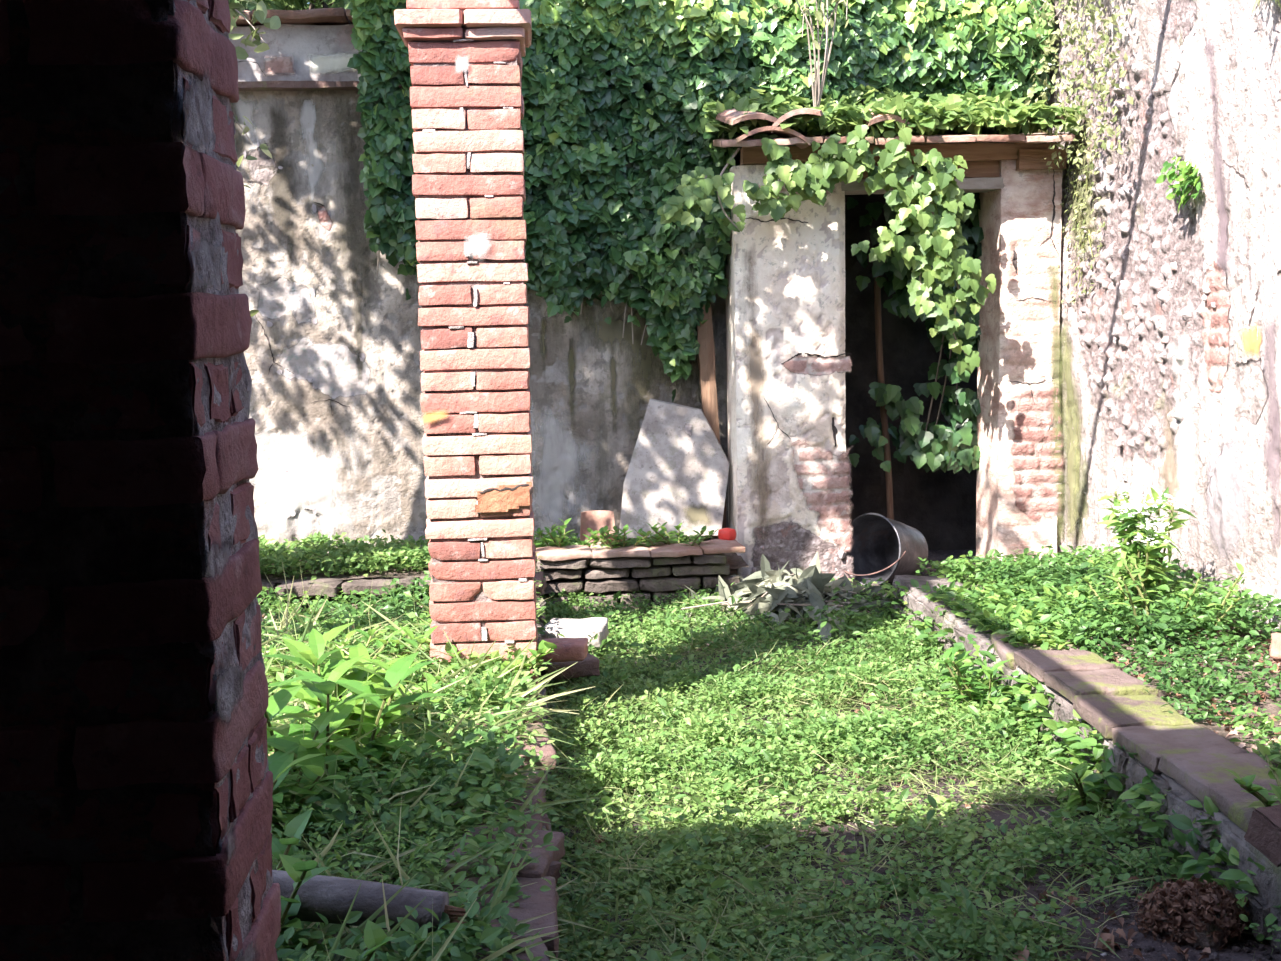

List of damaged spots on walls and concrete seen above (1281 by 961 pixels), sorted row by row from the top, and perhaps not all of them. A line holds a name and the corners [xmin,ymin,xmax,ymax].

spalling [1151,0,1197,52]
damp [231,101,323,260]
damp [340,110,371,377]
spalling [1061,25,1269,462]
spalling [781,348,852,378]
damp [256,440,337,533]
spalling [747,428,854,583]
spalling [1008,376,1063,521]